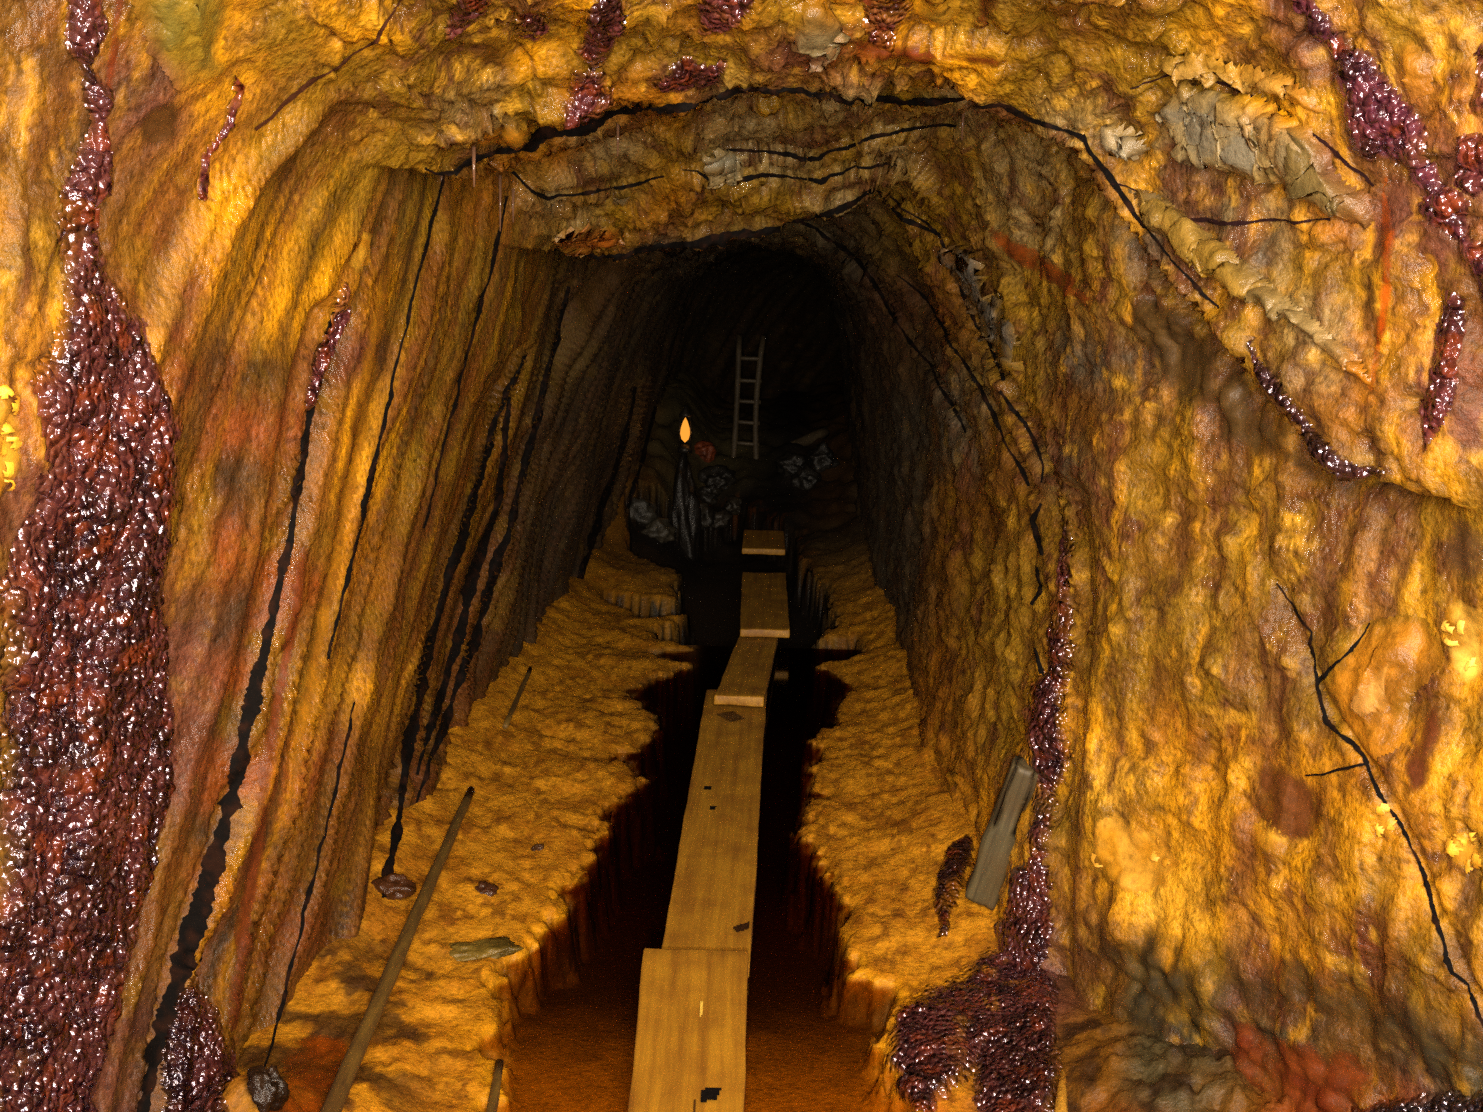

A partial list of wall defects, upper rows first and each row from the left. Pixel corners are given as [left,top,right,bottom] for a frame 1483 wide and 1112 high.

crack [1130,74,1170,89]
crack [1190,217,1330,226]
crack [1216,81,1374,187]
crack [327,87,1219,898]
crack [137,312,335,1112]
crack [264,702,356,1068]
crack [1276,583,1483,1026]